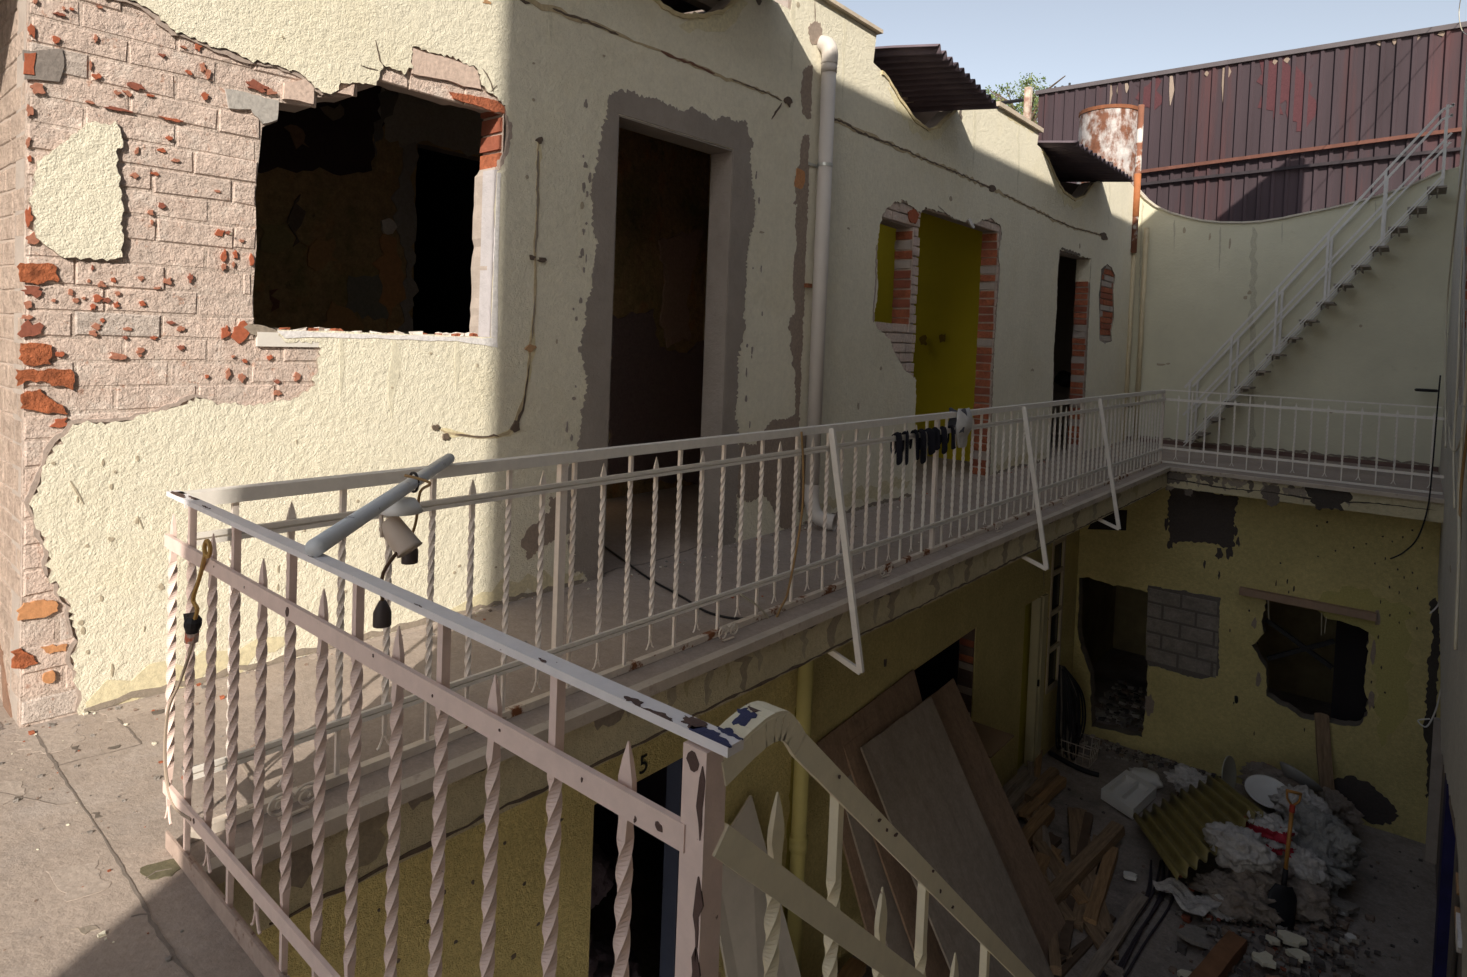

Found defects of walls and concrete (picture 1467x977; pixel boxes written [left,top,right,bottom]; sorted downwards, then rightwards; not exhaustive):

crack [361,40,383,71]
crack [520,0,618,35]
crack [661,50,782,101]
crack [834,119,1100,235]
spalling [11,0,512,728]
spalling [875,200,1001,474]
spalling [1099,265,1114,344]